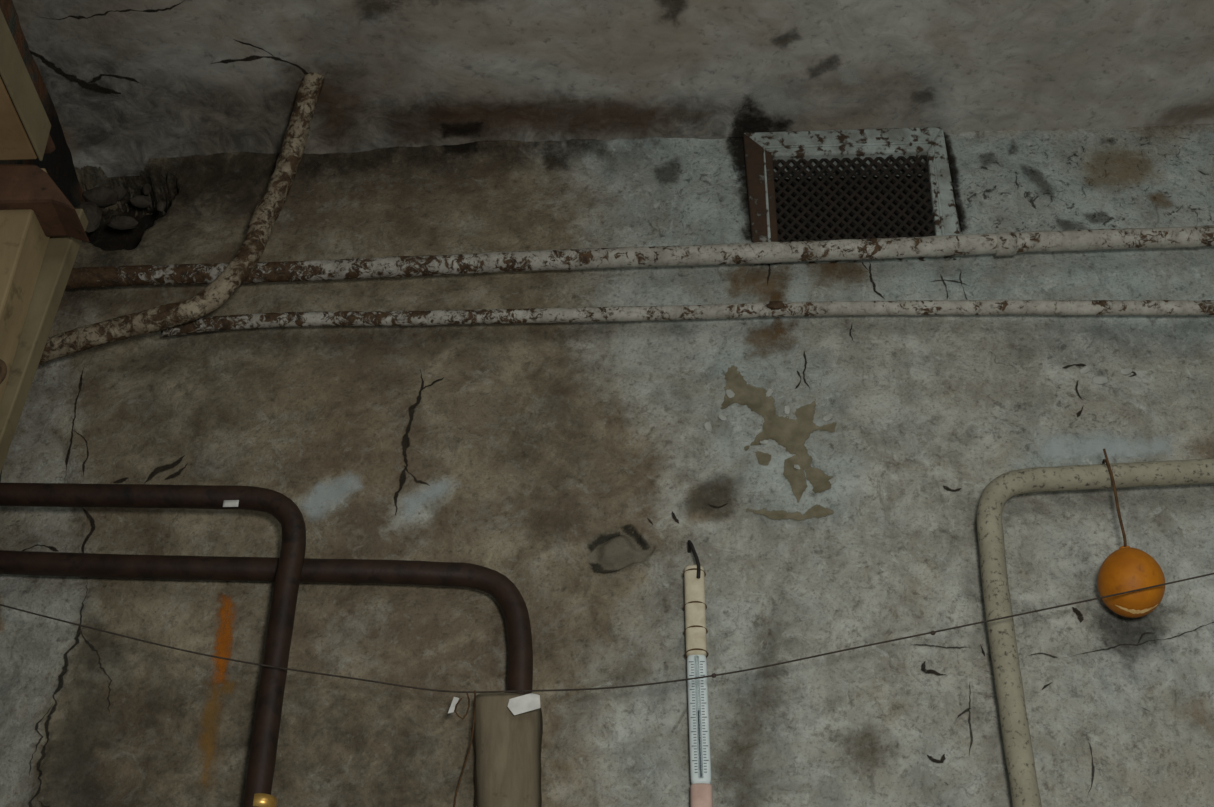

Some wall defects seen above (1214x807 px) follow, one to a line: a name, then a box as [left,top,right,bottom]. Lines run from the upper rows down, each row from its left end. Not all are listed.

crack [29,50,139,94]
crack [41,0,185,20]
crack [394,370,444,515]
peeling [704,365,837,521]
crack [22,507,95,553]
crack [29,583,112,807]
rust [202,597,233,782]